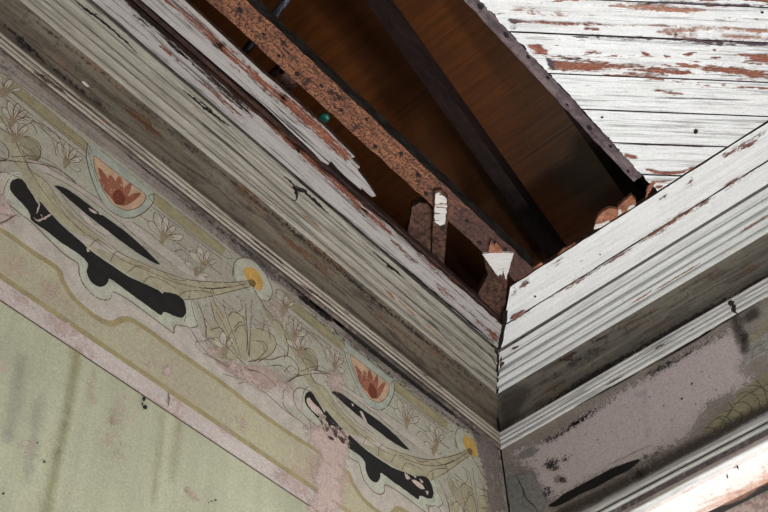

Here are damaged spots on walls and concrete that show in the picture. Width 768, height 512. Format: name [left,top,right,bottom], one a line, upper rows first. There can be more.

peeling [513,5,768,81]
peeling [609,3,706,14]
peeling [124,0,498,342]
peeling [645,167,695,200]
crack [265,143,573,394]
peeling [547,198,713,299]
damp [501,273,768,429]
peeling [303,397,351,512]
damp [542,455,569,497]
damp [543,401,611,443]
damp [558,405,768,512]